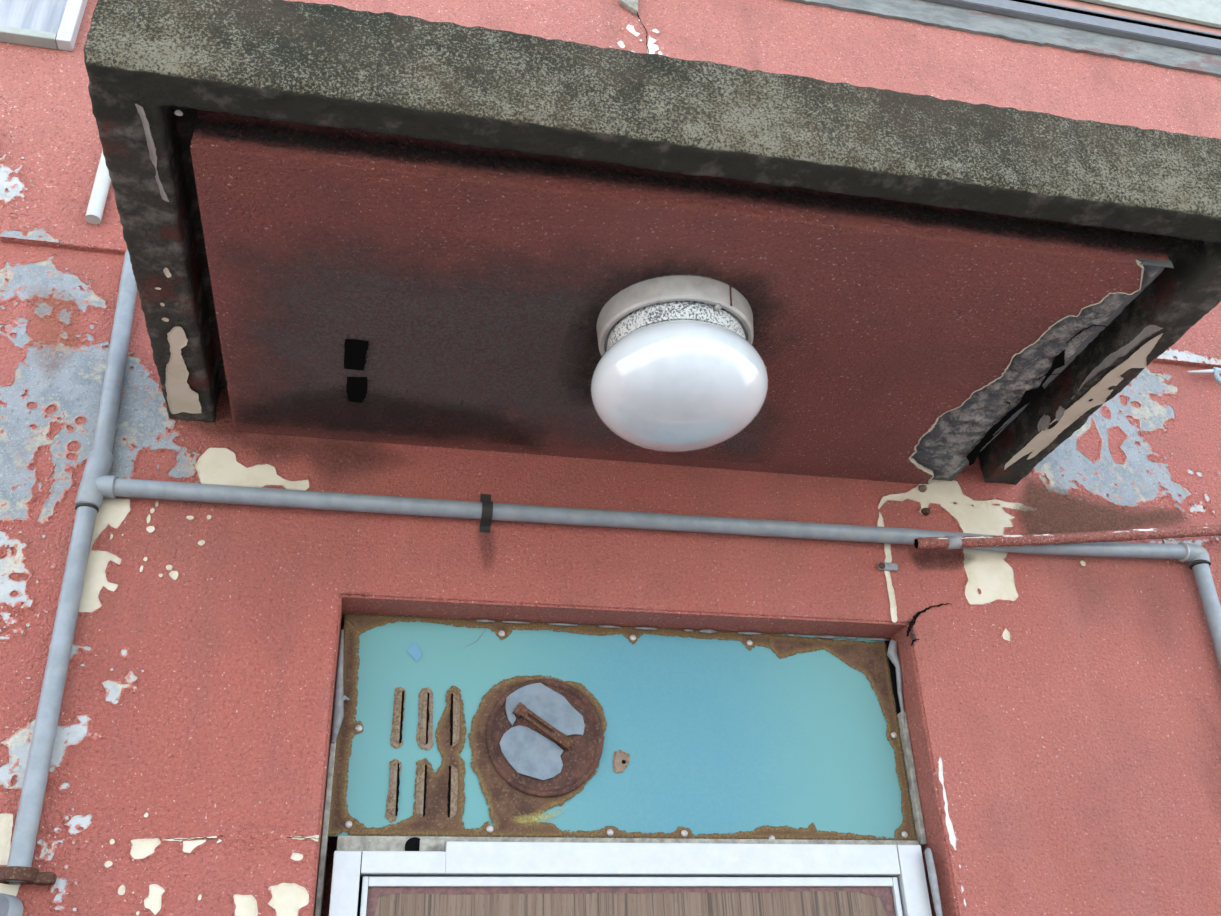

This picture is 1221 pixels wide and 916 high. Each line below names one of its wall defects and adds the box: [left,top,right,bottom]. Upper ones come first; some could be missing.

peeling [0,130,111,644]
peeling [110,267,312,491]
spalling [875,257,1174,535]
peeling [1004,325,1221,517]
peeling [78,497,134,616]
crack [877,512,952,646]
peeling [960,549,1020,608]
peeling [46,709,106,794]
corrosion [328,614,917,841]
peeling [0,808,211,916]
peeling [230,849,313,916]
peeling [935,754,969,909]